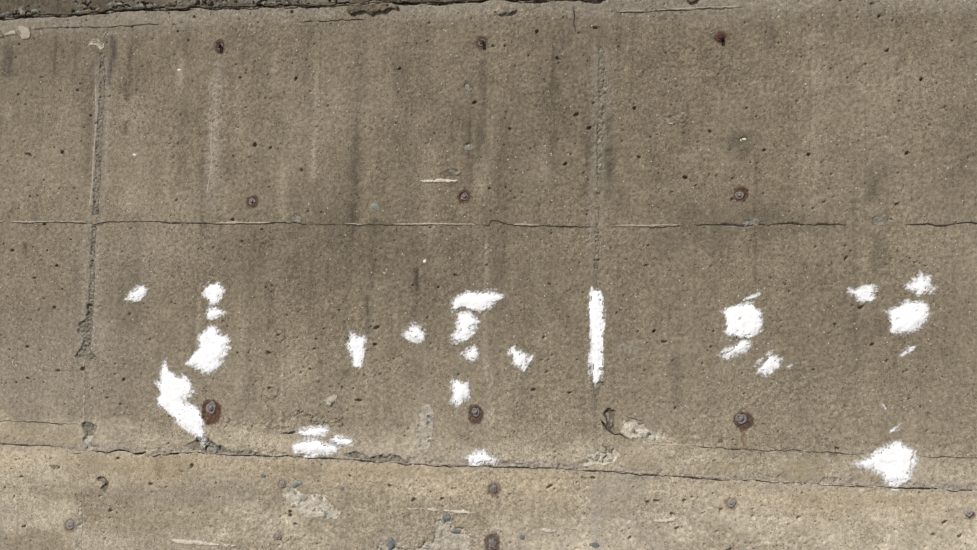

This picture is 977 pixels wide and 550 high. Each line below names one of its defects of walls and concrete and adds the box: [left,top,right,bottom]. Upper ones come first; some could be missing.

crack [0,0,734,31]
crack [4,420,78,446]
corrosion [201,400,221,425]
corrosion [469,405,483,423]
corrosion [734,412,753,430]
crack [72,430,972,492]